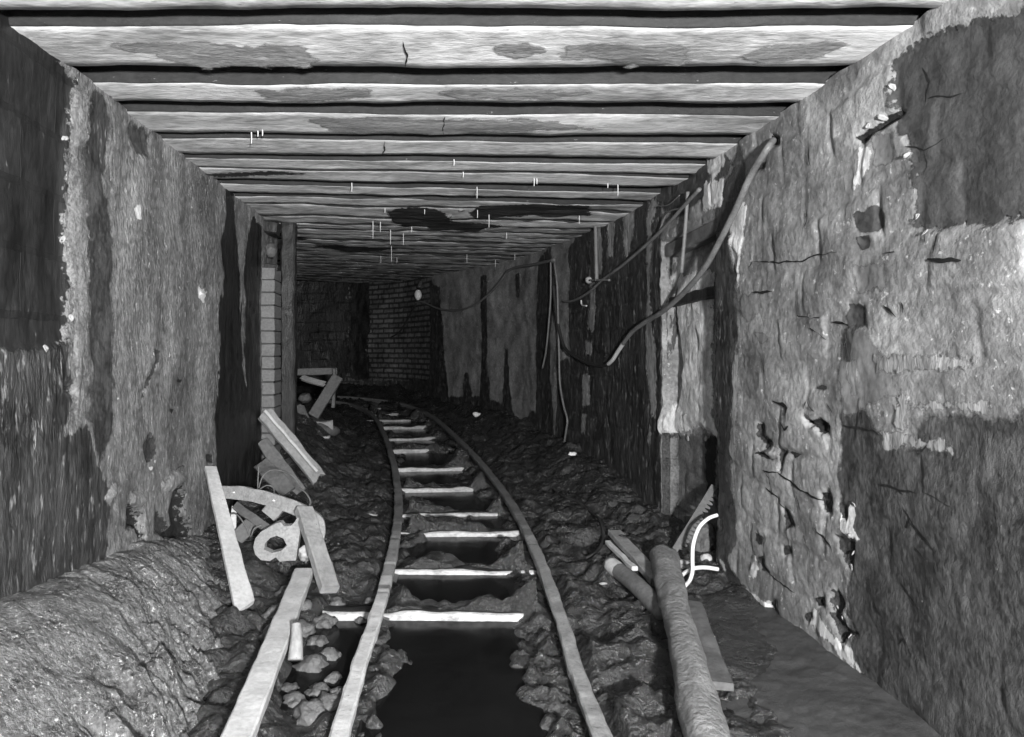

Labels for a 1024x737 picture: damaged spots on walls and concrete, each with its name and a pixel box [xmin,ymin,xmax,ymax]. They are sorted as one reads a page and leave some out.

leakage [110,42,319,70]
leakage [494,43,547,58]
leakage [560,43,691,69]
spalling [856,6,1024,236]
spalling [854,205,883,250]
crack [924,231,961,263]
crack [749,242,848,340]
leakage [296,142,759,585]
spalling [809,418,830,434]
crack [773,399,885,438]
crack [763,470,833,555]
spalling [805,589,859,644]